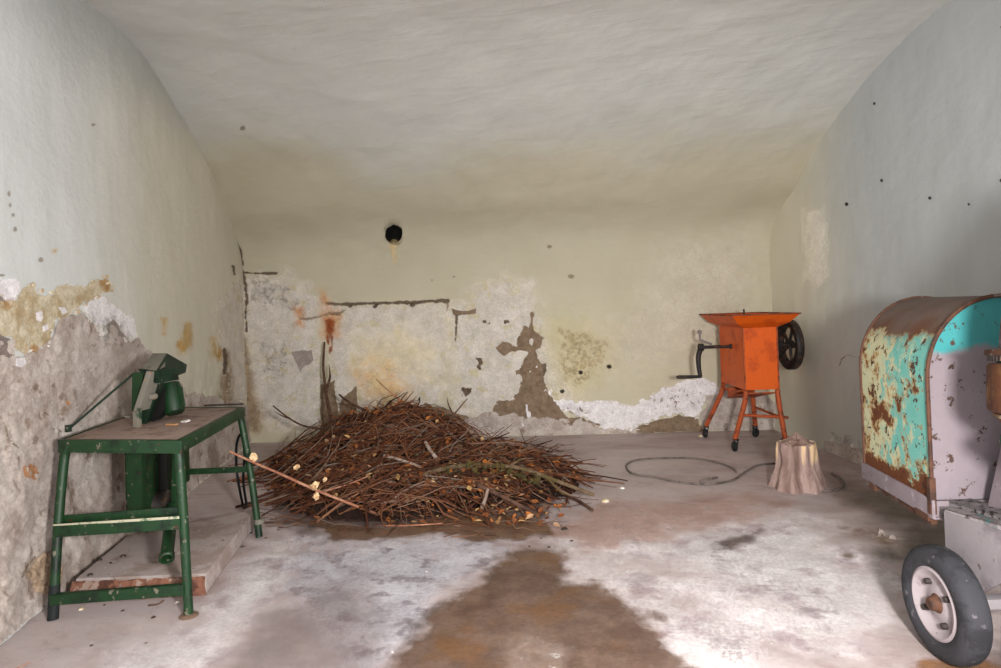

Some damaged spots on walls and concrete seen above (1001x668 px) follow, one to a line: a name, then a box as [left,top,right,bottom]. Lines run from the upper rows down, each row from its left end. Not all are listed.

flaking render [0,275,207,644]
peeling [164,275,358,496]
corrosion [325,314,334,353]
efflorescence [546,378,720,432]
leakage [565,516,897,668]